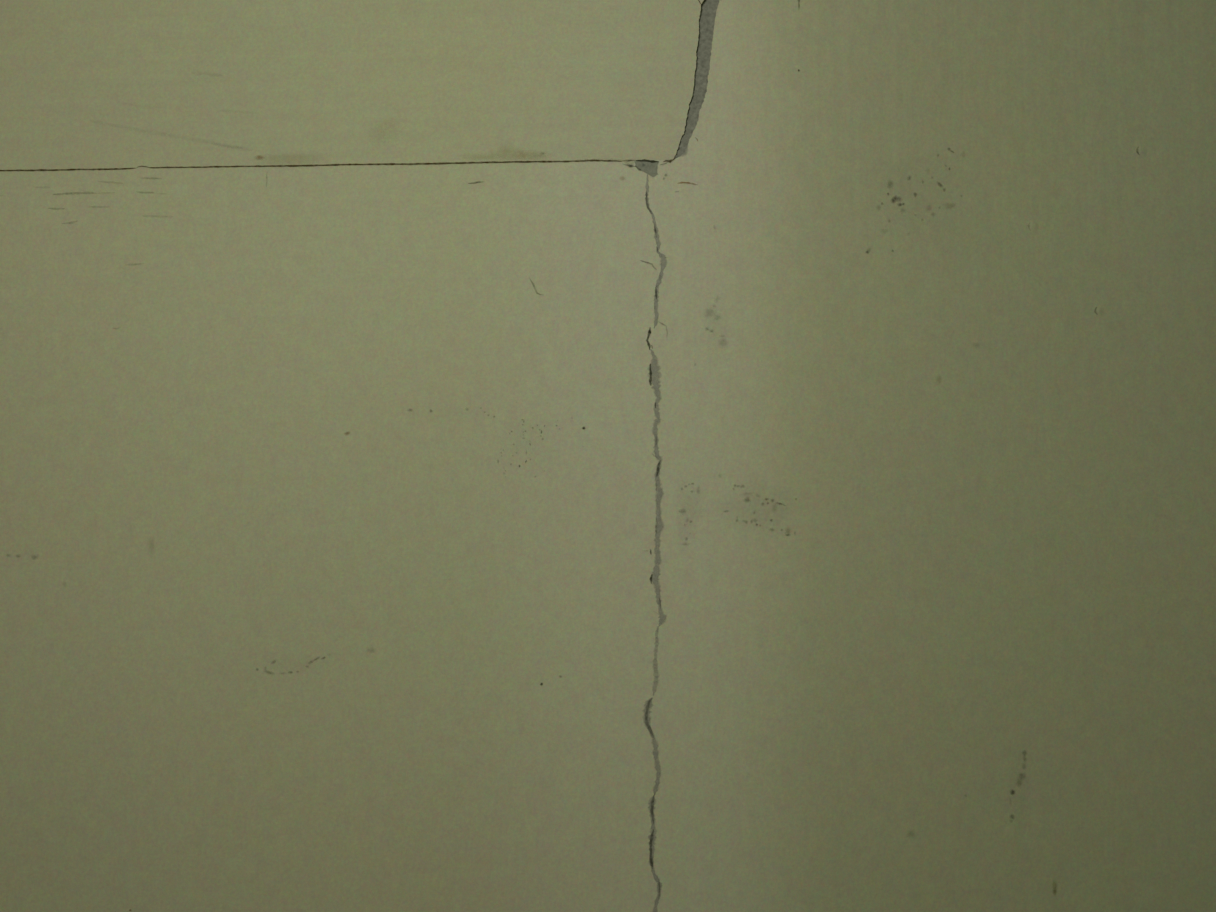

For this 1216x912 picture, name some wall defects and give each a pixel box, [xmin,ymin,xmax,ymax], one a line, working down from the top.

crack [0,0,719,912]